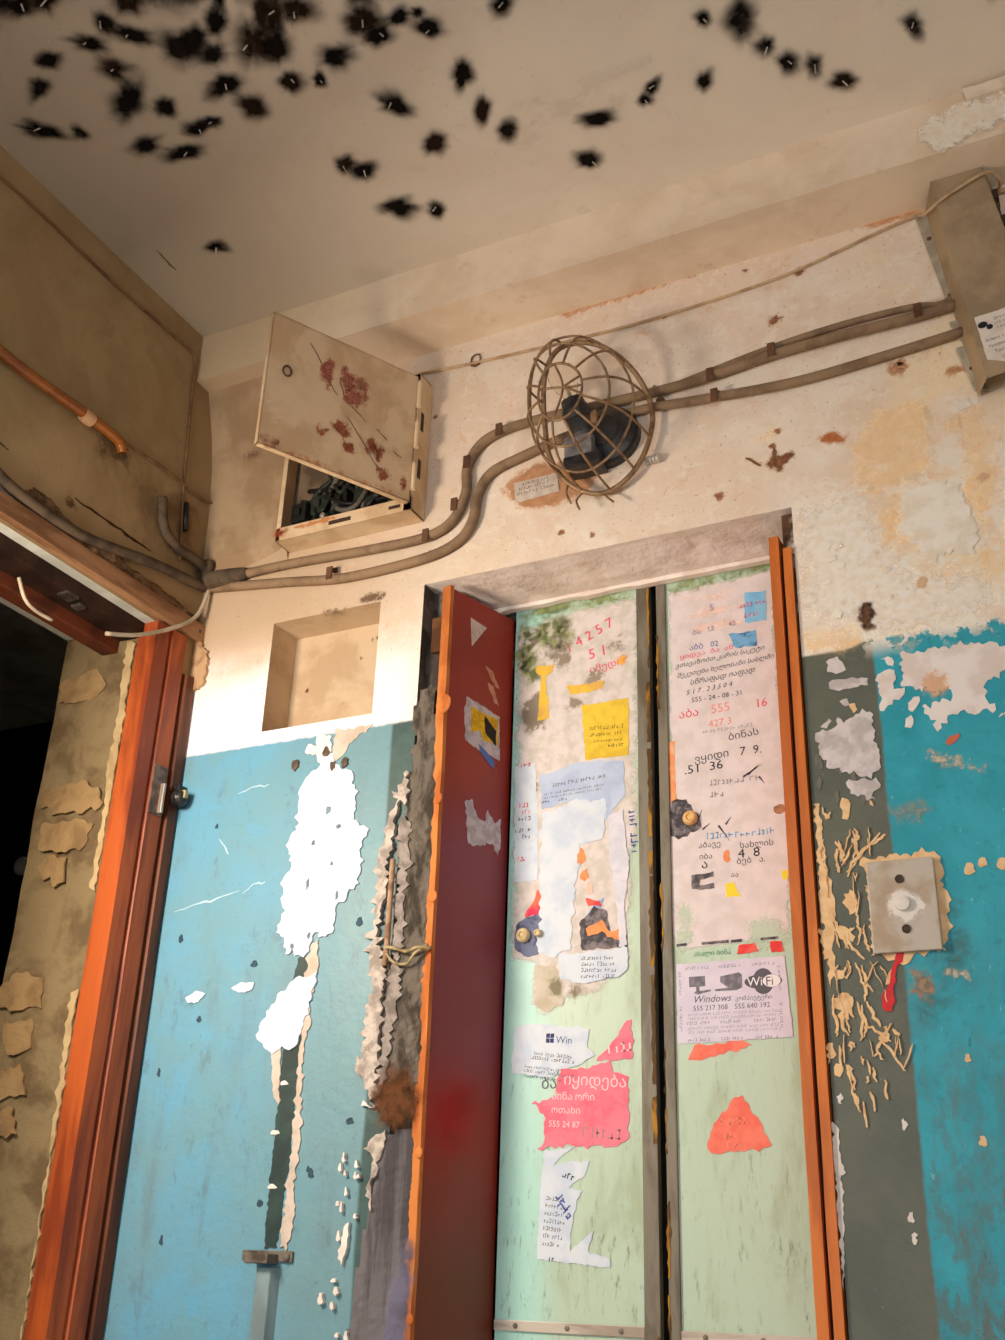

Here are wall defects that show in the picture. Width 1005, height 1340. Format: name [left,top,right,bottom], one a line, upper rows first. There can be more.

peeling [919,90,1005,152]
rust [745,428,795,472]
crack [75,497,151,552]
peeling [291,723,374,771]
peeling [840,798,851,820]
peeling [813,803,827,881]
peeling [964,857,1005,875]
spalling [346,685,436,1125]
peeling [818,847,954,1020]
flaking render [0,971,45,1139]
spalling [317,1129,421,1340]